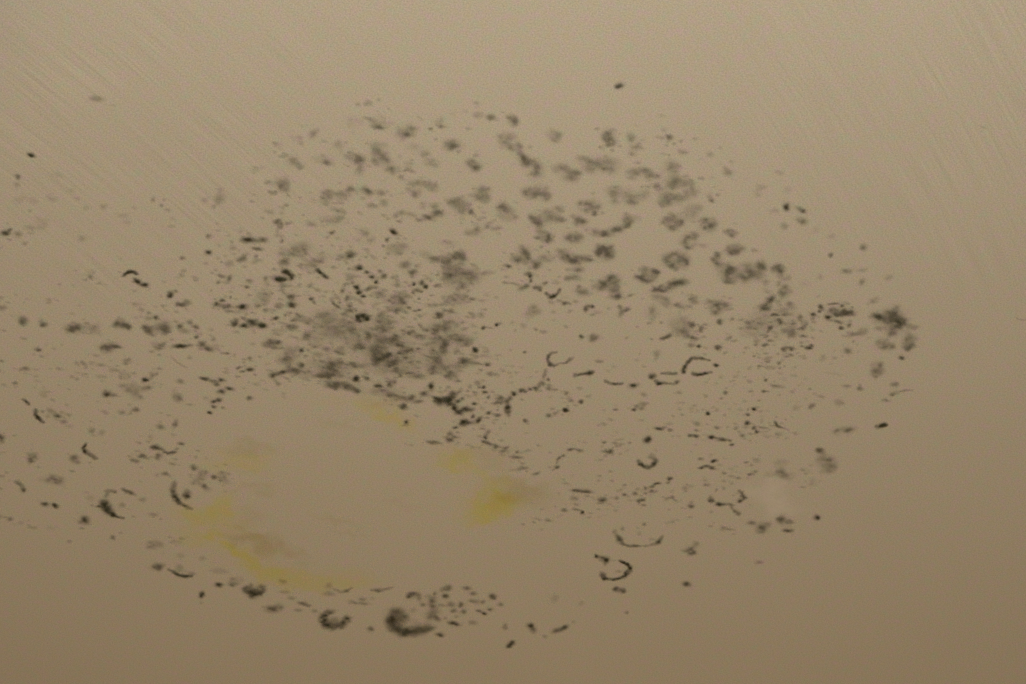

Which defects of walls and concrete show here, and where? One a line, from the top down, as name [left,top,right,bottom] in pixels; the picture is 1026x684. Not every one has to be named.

water stain [429,384,489,424]
water stain [390,616,425,636]